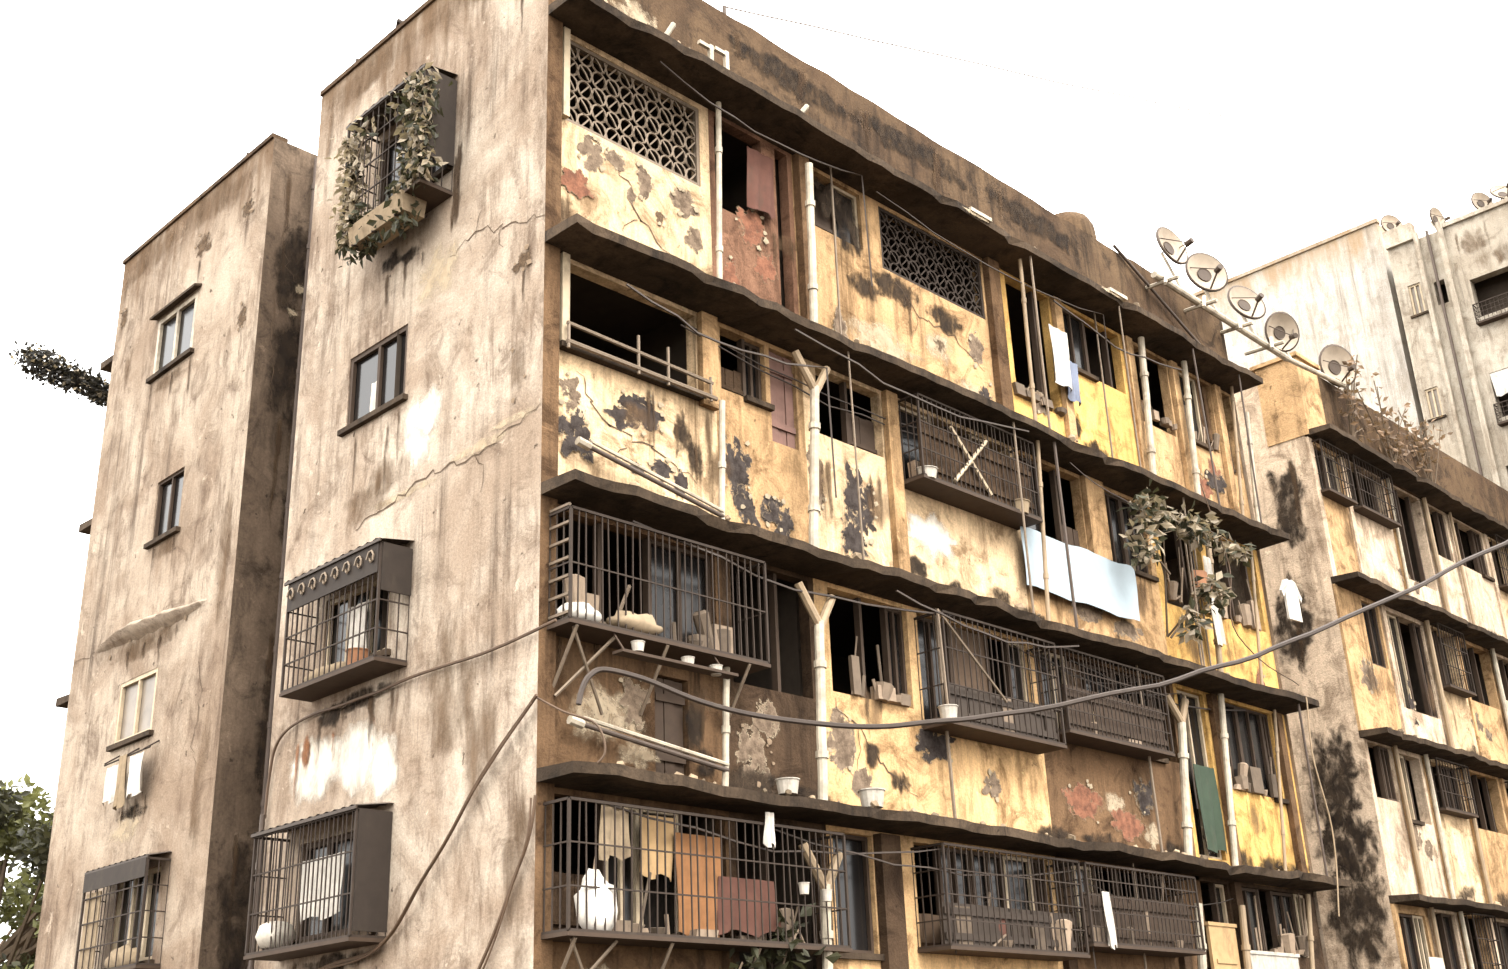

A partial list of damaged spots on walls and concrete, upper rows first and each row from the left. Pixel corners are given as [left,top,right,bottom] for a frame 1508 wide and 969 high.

crack [450,210,544,257]
damp [561,199,571,222]
damp [267,179,308,538]
crack [578,372,697,484]
crack [356,405,539,530]
damp [820,461,833,517]
damp [870,475,882,522]
corrosion [294,735,310,786]
peeling [982,768,1002,803]
peeling [1061,778,1154,842]